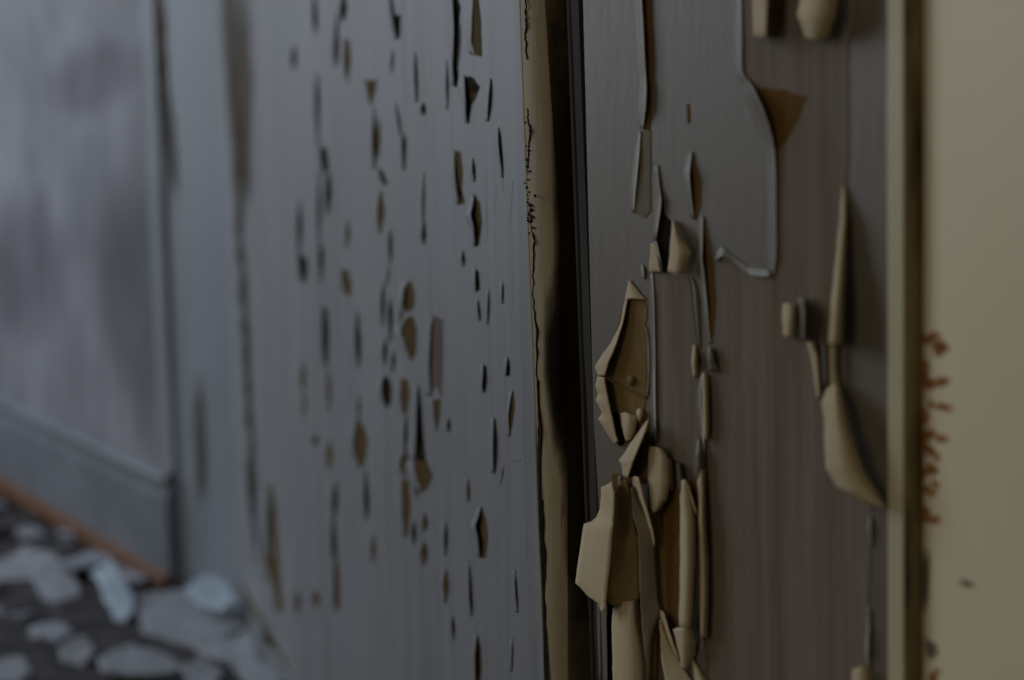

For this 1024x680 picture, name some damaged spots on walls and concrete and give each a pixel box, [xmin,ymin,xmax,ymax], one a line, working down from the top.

peeling [293,72,332,283]
peeling [331,0,451,565]
peeling [443,0,503,178]
peeling [450,150,504,325]
crack [500,219,546,619]
crack [522,0,530,60]
crack [525,108,533,174]
peeling [575,0,886,680]
rust [922,331,952,524]
peeling [257,435,340,614]
peeling [464,478,488,616]
peeling [471,634,482,680]